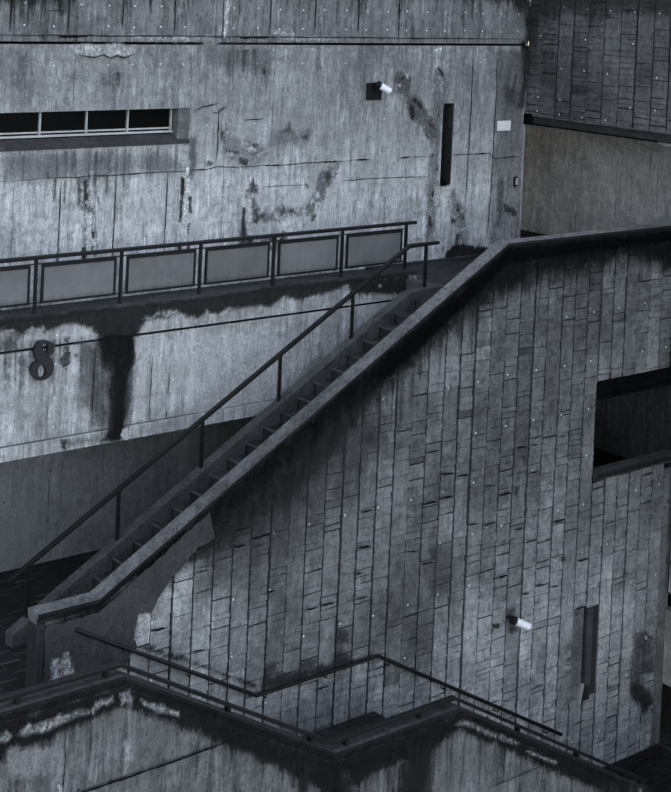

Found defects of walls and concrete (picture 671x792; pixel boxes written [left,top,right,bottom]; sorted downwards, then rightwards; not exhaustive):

spalling [71,43,134,59]
water stain [495,0,671,108]
water stain [0,231,671,624]
peeling [42,512,215,683]
water stain [631,631,656,714]
water stain [0,681,645,792]